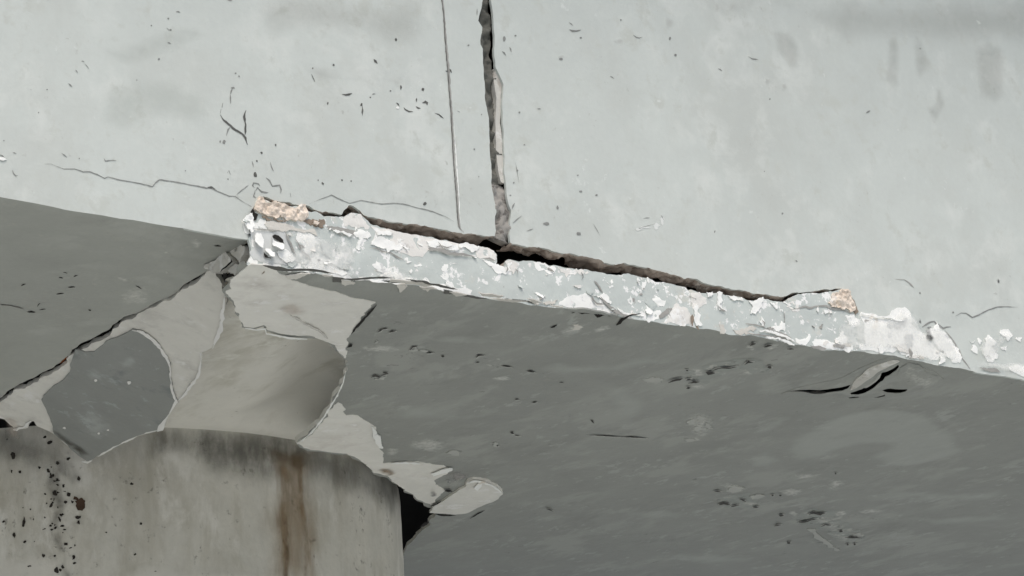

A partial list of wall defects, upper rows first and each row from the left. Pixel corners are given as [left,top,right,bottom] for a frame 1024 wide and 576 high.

crack [52,0,850,335]
crack [4,314,133,396]
peeling [0,196,617,557]
peeling [628,277,1024,390]
crack [880,365,899,378]
crack [923,306,1011,369]
peeling [714,472,888,551]